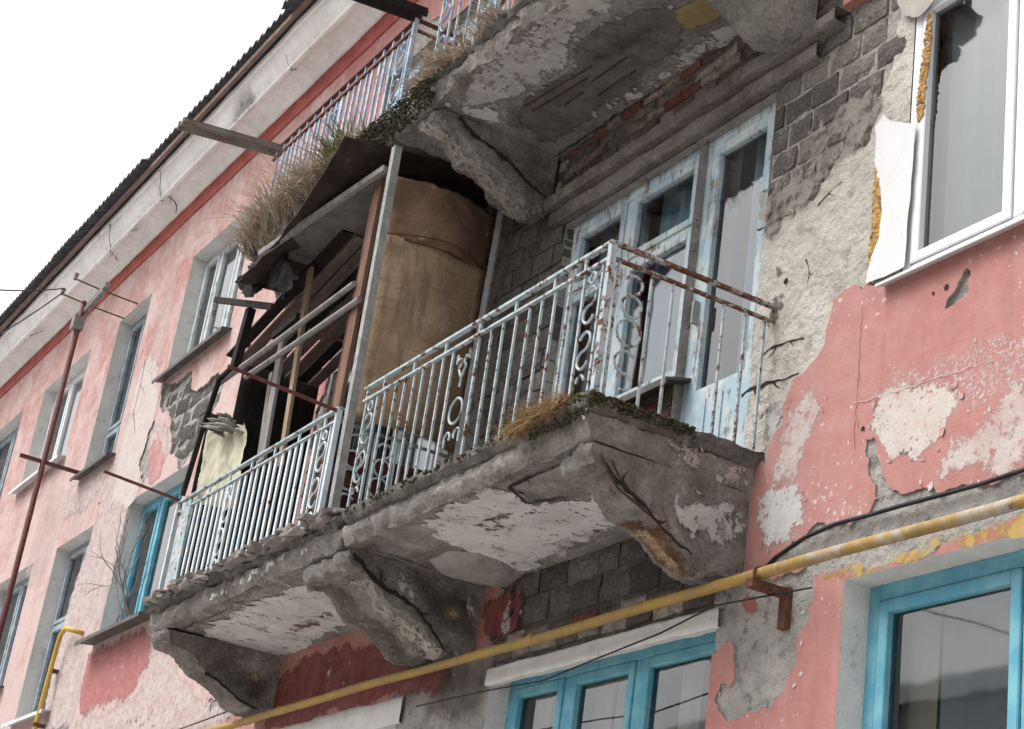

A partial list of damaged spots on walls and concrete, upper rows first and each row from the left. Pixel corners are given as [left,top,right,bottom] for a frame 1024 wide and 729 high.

spalling [445,0,765,194]
crack [458,116,547,199]
flaking render [738,0,1024,563]
crack [741,338,804,402]
peeling [41,281,231,729]
crack [352,547,485,652]
crack [507,465,567,505]
peeling [202,488,1024,729]
crack [600,454,693,555]
corrosion [620,521,692,578]